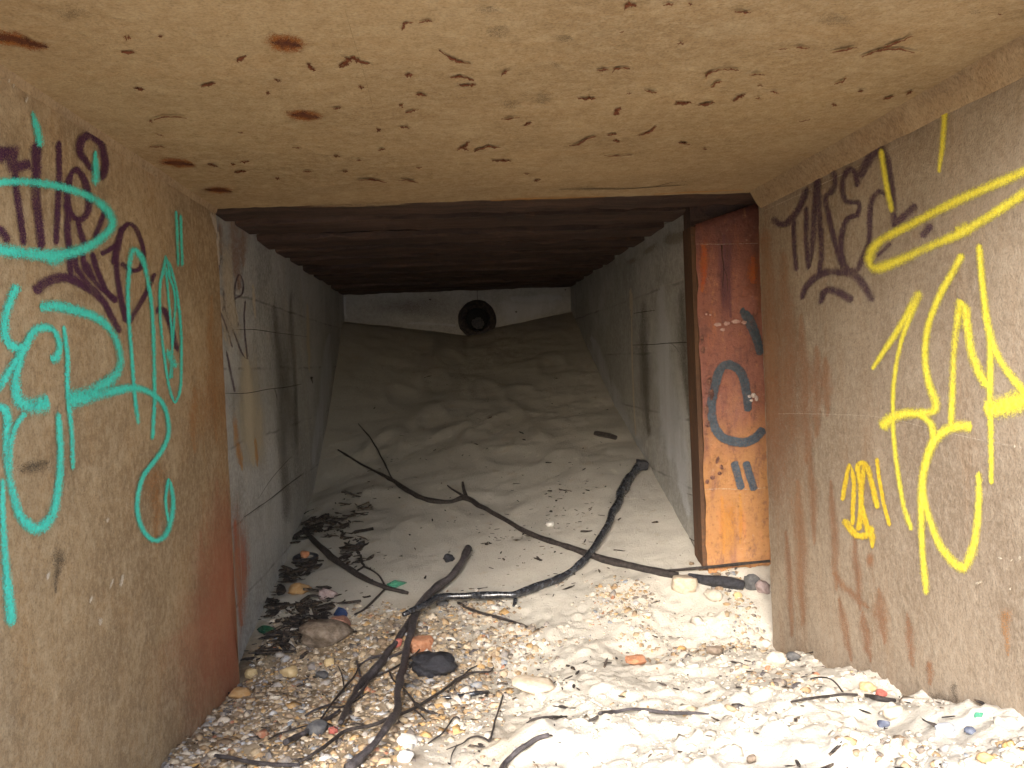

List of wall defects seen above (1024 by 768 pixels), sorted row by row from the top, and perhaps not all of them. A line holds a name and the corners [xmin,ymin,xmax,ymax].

rust [0,29,49,52]
rust [266,31,307,54]
rust [832,36,915,57]
rust [339,55,370,68]
rust [439,50,476,87]
rust [282,108,323,122]
rust [150,134,217,169]
rust [783,447,888,663]